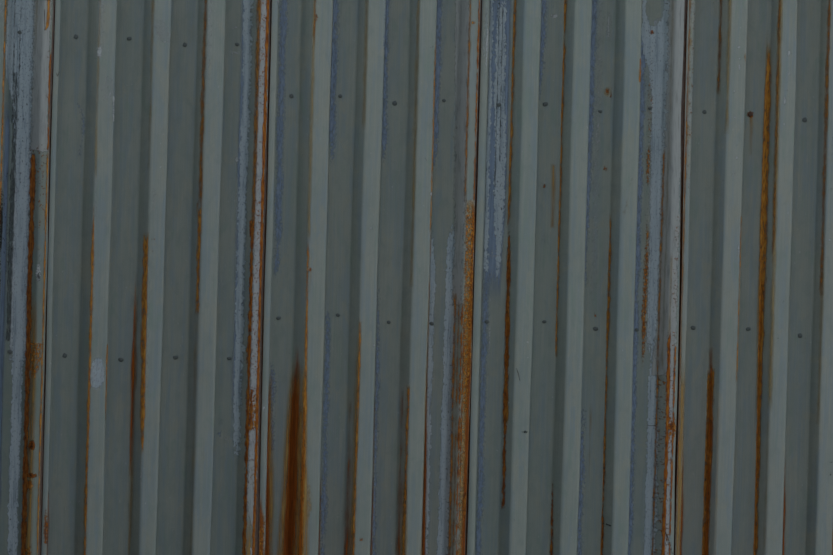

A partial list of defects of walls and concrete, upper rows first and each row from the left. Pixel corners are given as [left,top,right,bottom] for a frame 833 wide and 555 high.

peeling [0,0,52,555]
rust [21,51,51,555]
rust [242,0,311,555]
rust [448,0,480,555]
peeling [476,0,510,555]
peeling [585,0,602,285]
rust [641,225,649,357]
peeling [628,0,685,555]
rust [648,327,684,555]